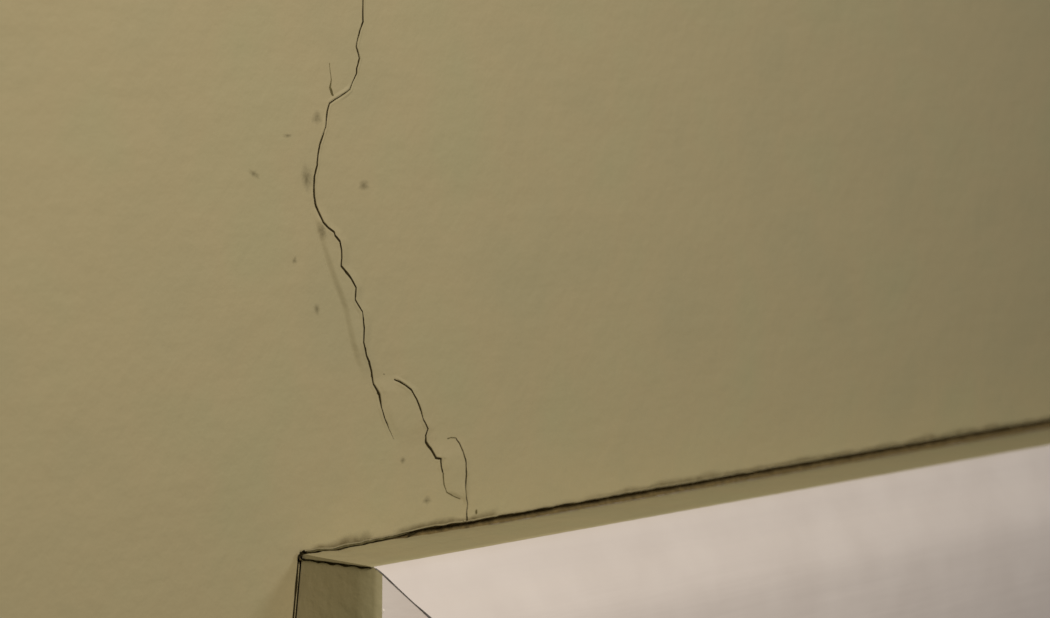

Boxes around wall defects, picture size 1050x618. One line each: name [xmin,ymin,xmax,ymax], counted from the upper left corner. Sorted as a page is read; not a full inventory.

crack [293,0,1050,618]